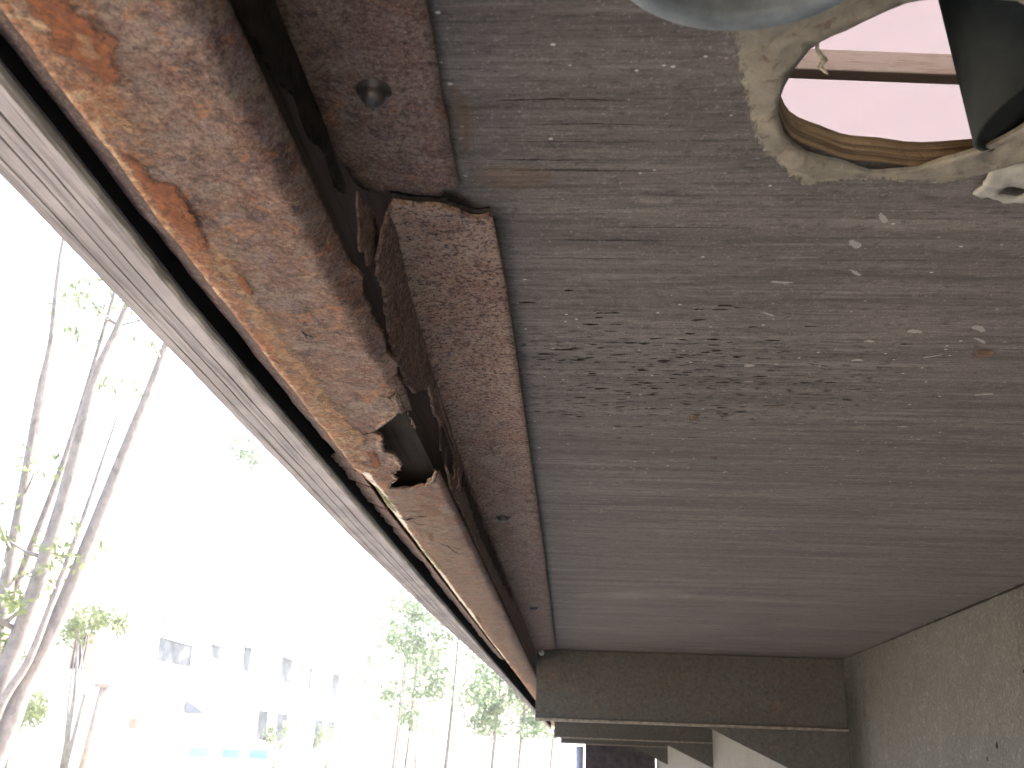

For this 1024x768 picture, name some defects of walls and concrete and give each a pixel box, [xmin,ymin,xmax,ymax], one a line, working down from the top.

corrosion [355,191,380,266]
crack [390,191,490,210]
corrosion [213,252,513,664]